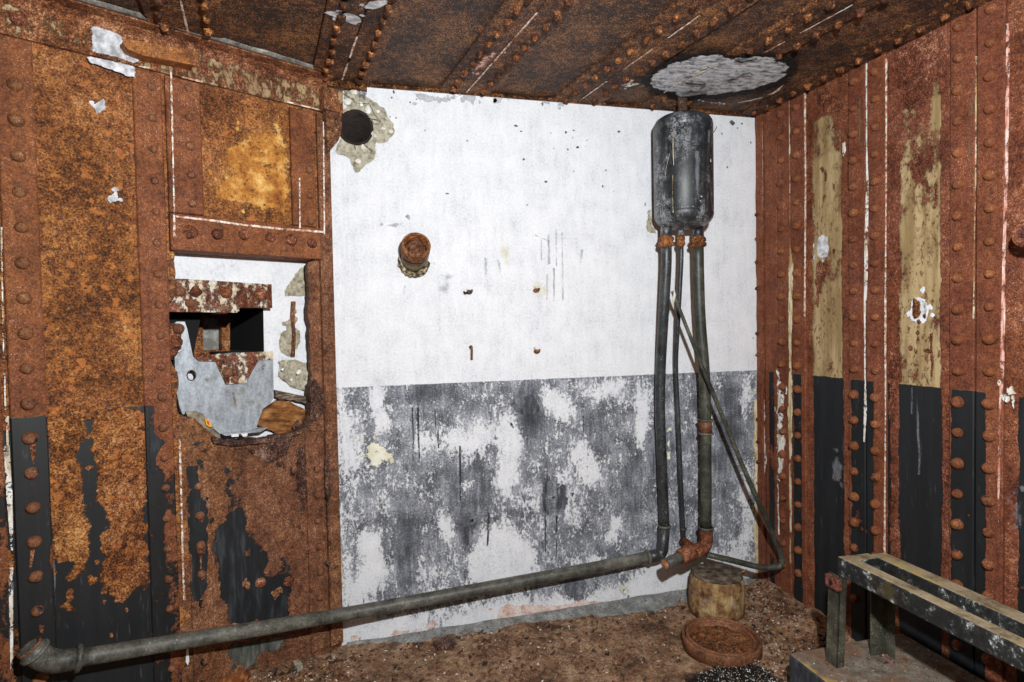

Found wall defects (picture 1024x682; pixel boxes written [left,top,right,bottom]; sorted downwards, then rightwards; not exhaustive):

peeling [87,26,139,78]
rust [893,32,947,123]
spalling [336,90,397,172]
rust [906,134,938,209]
spalling [278,266,309,391]
peeling [813,235,829,262]
rust [809,249,835,308]
spalling [906,286,935,324]
rust [239,425,296,468]
peeling [360,435,394,468]
rust [888,314,934,542]
rust [47,404,150,612]